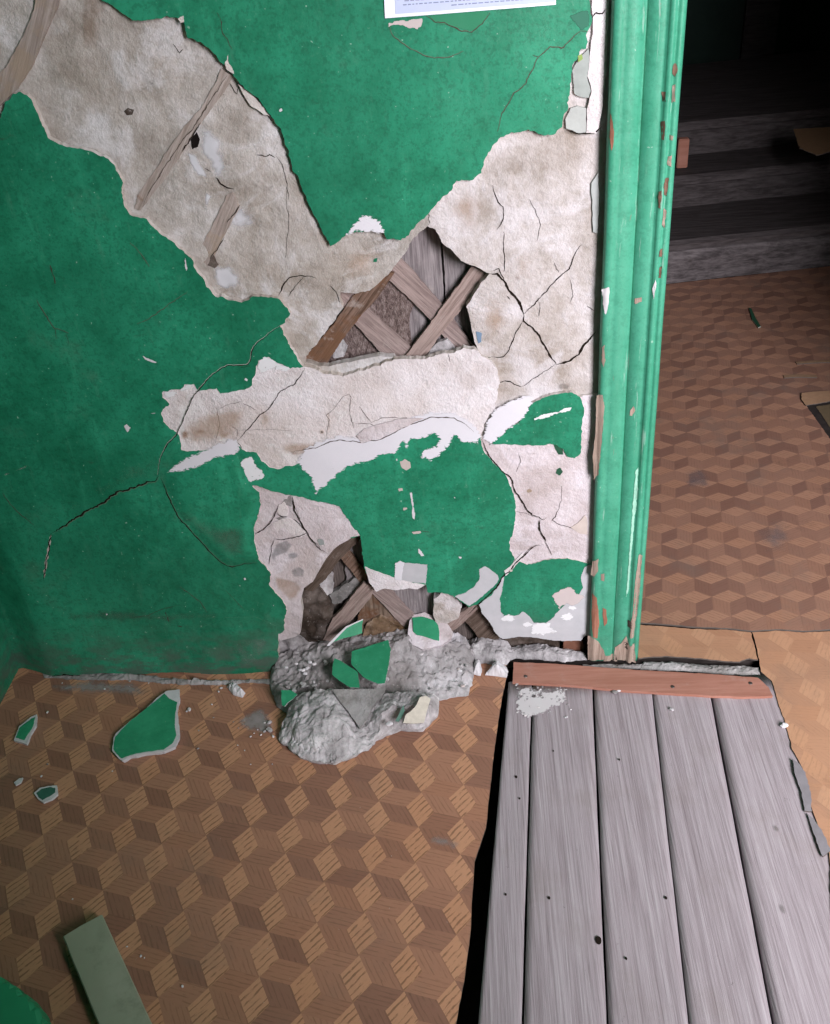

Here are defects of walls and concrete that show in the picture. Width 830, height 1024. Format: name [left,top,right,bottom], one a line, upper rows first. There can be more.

crack [497,30,588,131]
flaking render [0,0,643,663]
crack [492,245,596,386]
crack [3,325,281,579]
crack [237,374,302,449]